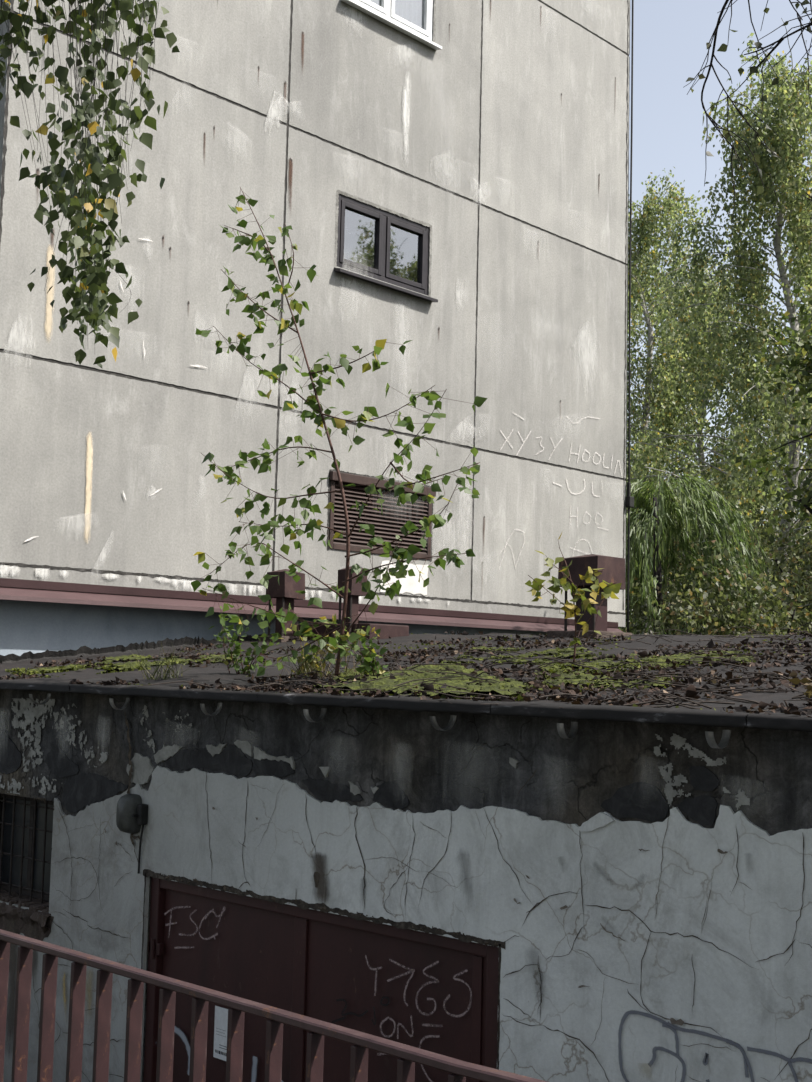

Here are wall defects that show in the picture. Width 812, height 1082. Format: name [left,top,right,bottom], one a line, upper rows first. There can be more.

crack [48,808,140,966]
crack [238,782,316,888]
peeling [0,689,812,836]
crack [354,807,812,1082]